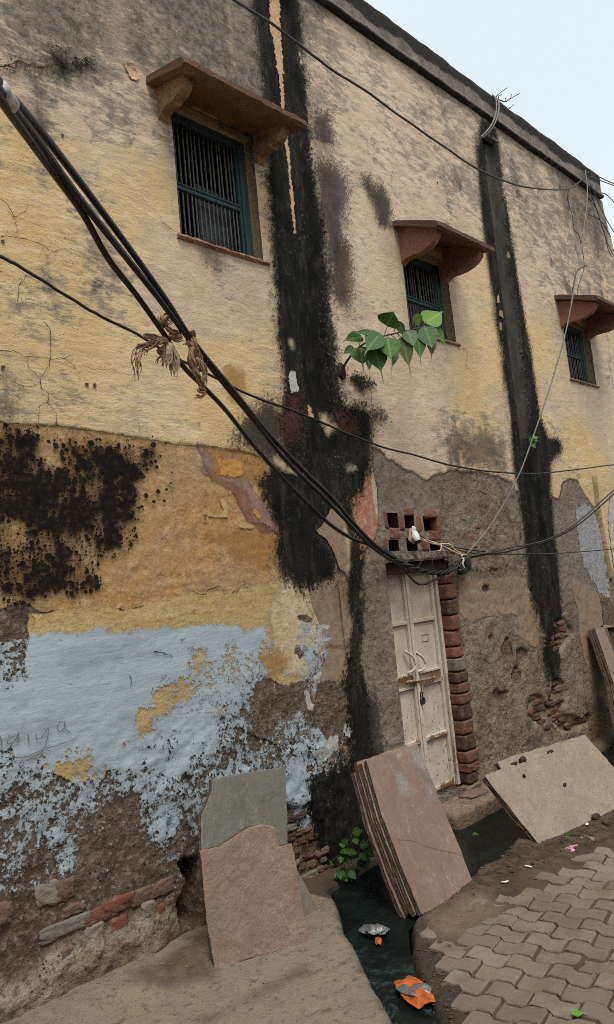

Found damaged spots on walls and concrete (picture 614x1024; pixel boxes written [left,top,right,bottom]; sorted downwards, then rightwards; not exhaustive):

crack [1,199,83,256]
damp [0,356,173,610]
peeling [0,421,614,984]
damp [216,0,402,870]
damp [444,118,567,690]